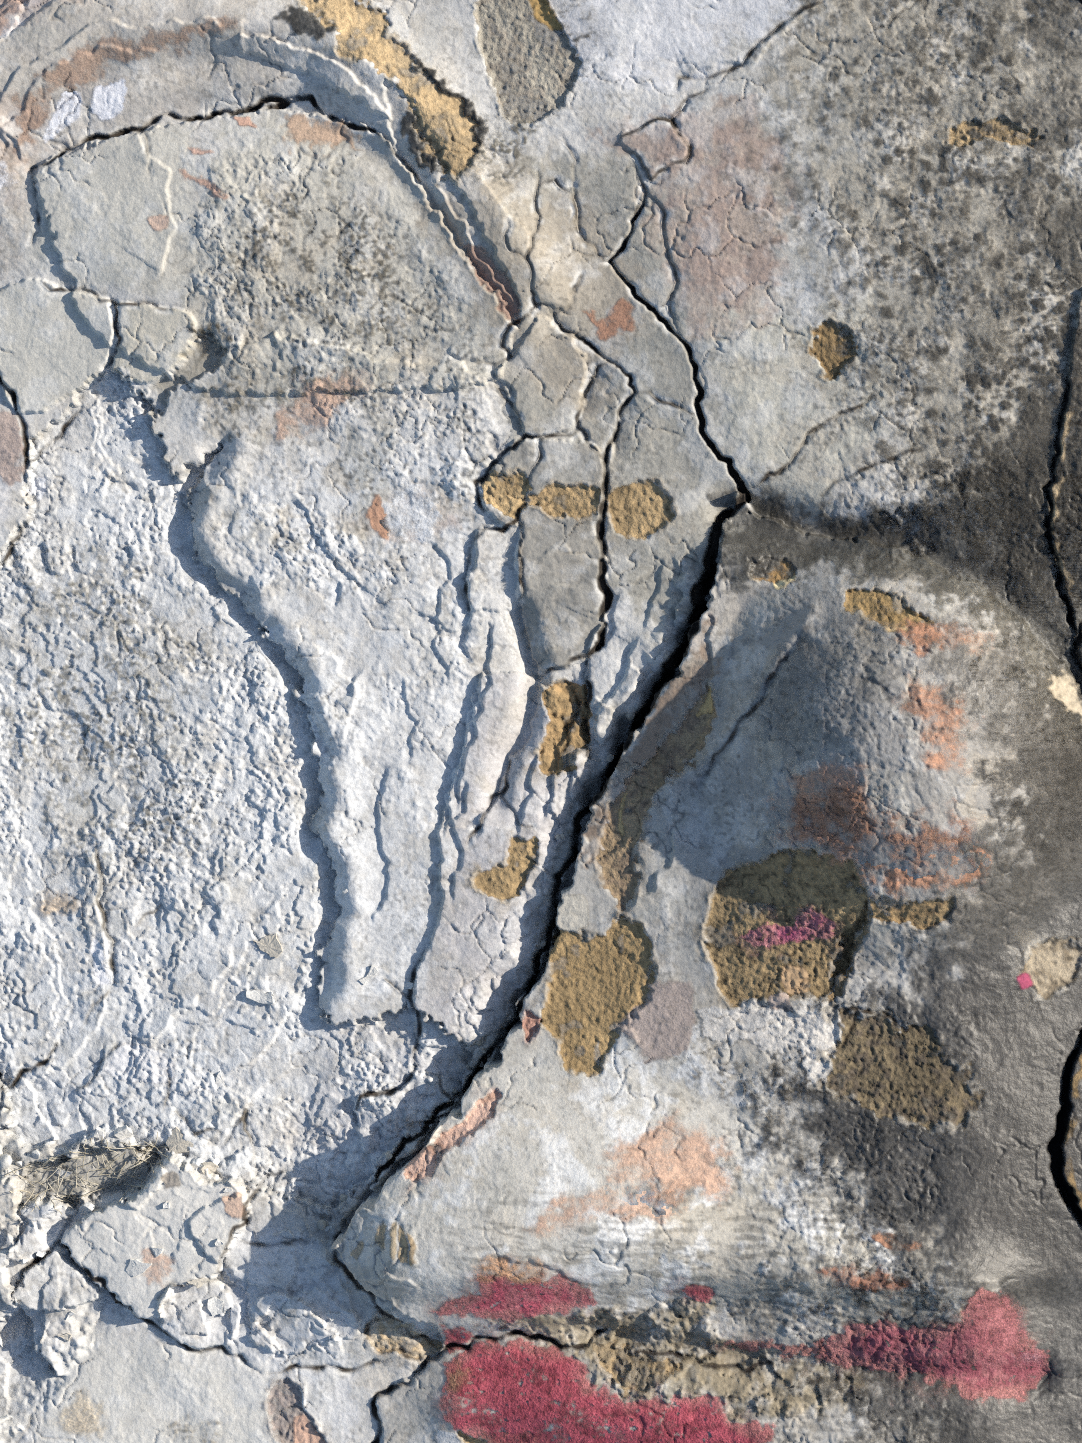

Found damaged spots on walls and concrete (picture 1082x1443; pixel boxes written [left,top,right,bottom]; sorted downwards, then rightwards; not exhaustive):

crack [49,95,379,163]
spalling [297,0,482,185]
spalling [473,0,582,128]
crack [0,377,75,466]
spalling [481,467,677,540]
crack [1043,382,1082,670]
spalling [0,370,502,1218]
crack [223,1,863,1443]
damp [707,0,1082,1443]
spalling [522,679,991,1133]
crack [1048,1030,1082,1222]
crack [22,1244,245,1361]